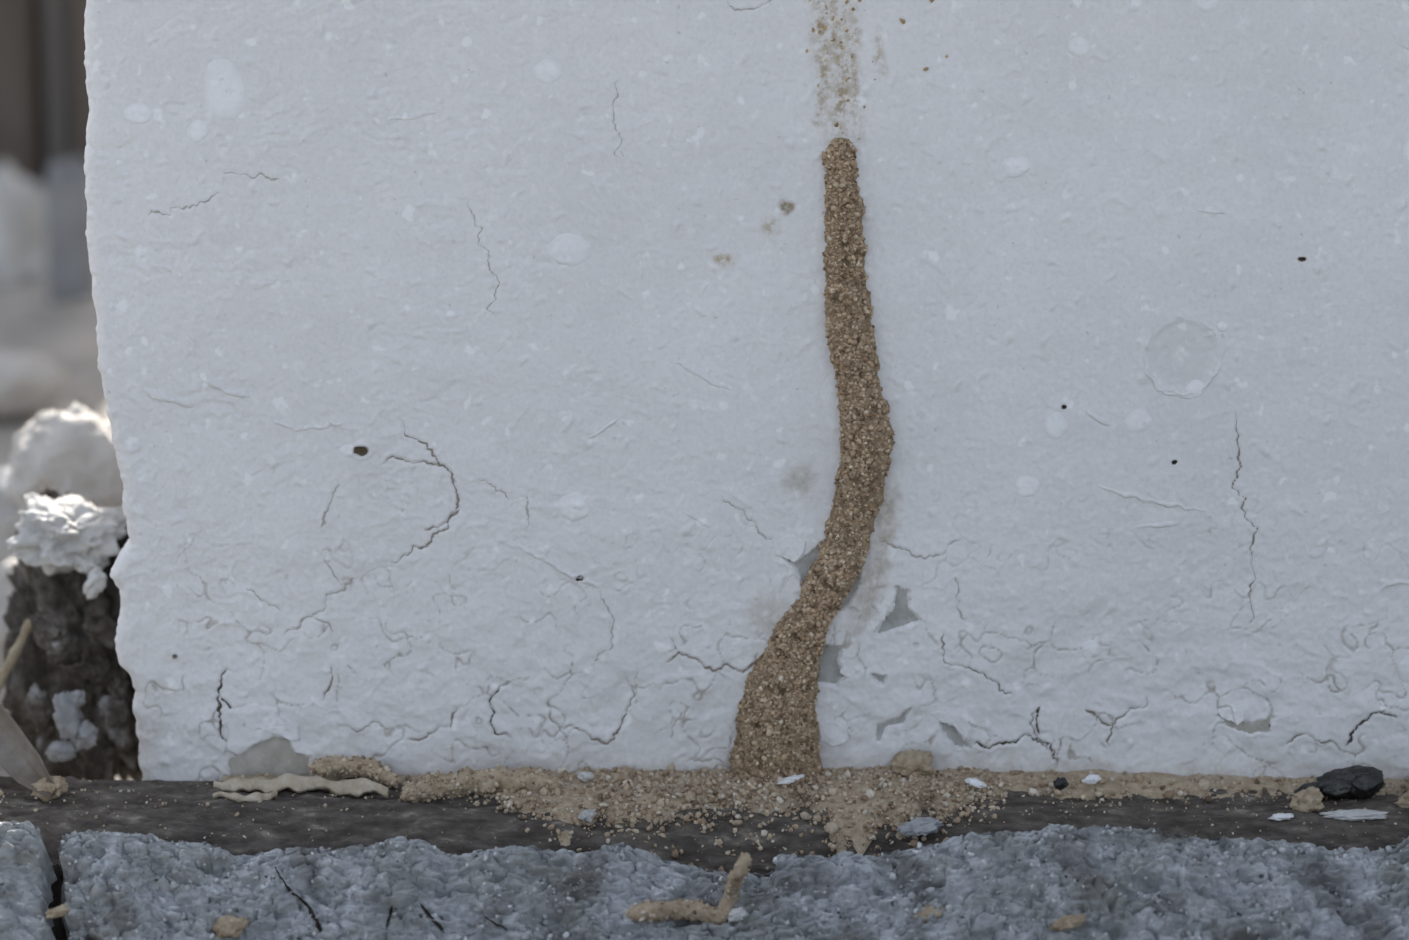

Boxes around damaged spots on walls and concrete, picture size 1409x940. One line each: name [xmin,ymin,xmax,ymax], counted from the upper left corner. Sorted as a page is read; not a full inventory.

crack [383,418,529,563]
crack [1232,421,1258,623]
crack [247,485,358,633]
spalling [869,586,918,633]
crack [665,639,757,673]
spalling [818,645,884,683]
crack [877,537,1059,763]
crack [216,669,231,752]
crack [324,669,510,741]
crack [547,689,635,745]
crack [1085,696,1148,747]
crack [1286,711,1397,745]